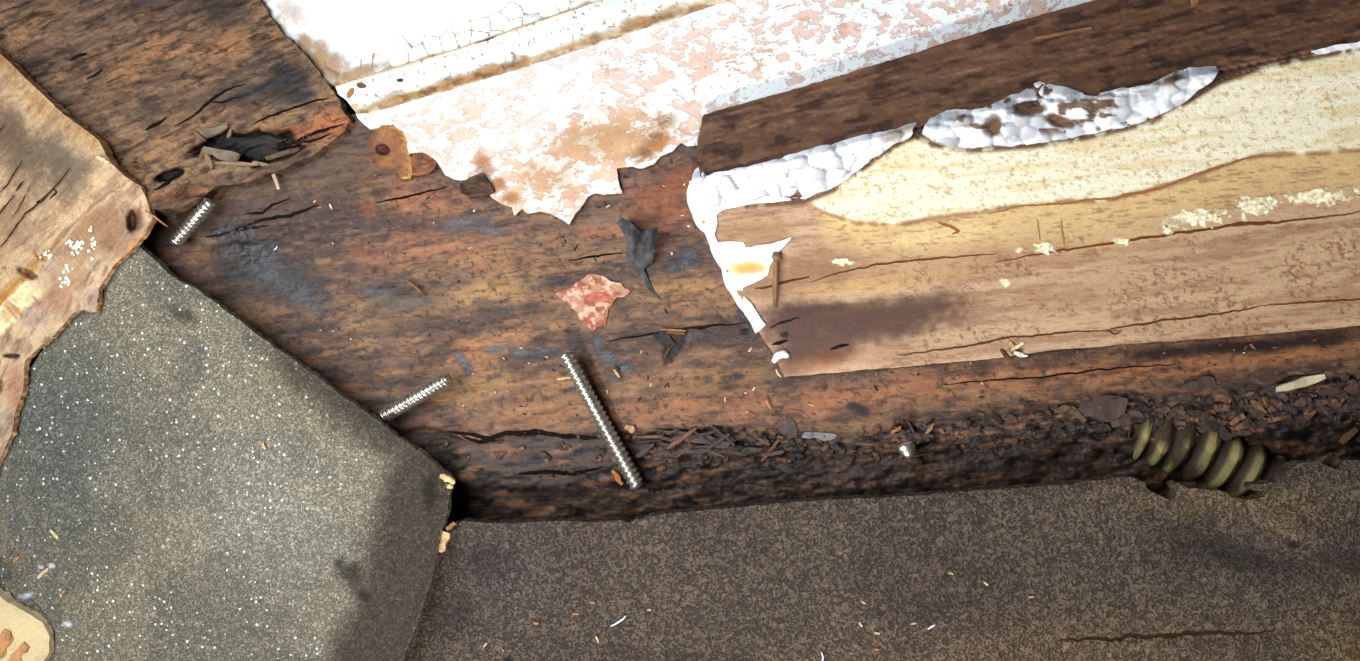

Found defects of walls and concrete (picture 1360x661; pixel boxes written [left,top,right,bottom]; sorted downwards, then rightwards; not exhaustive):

peeling [347,82,366,109]
spalling [193,122,302,169]
crack [0,160,70,247]
crack [755,155,1360,289]
crack [606,317,800,345]
crack [830,343,849,351]
crack [902,299,1360,356]
crack [945,364,1176,385]